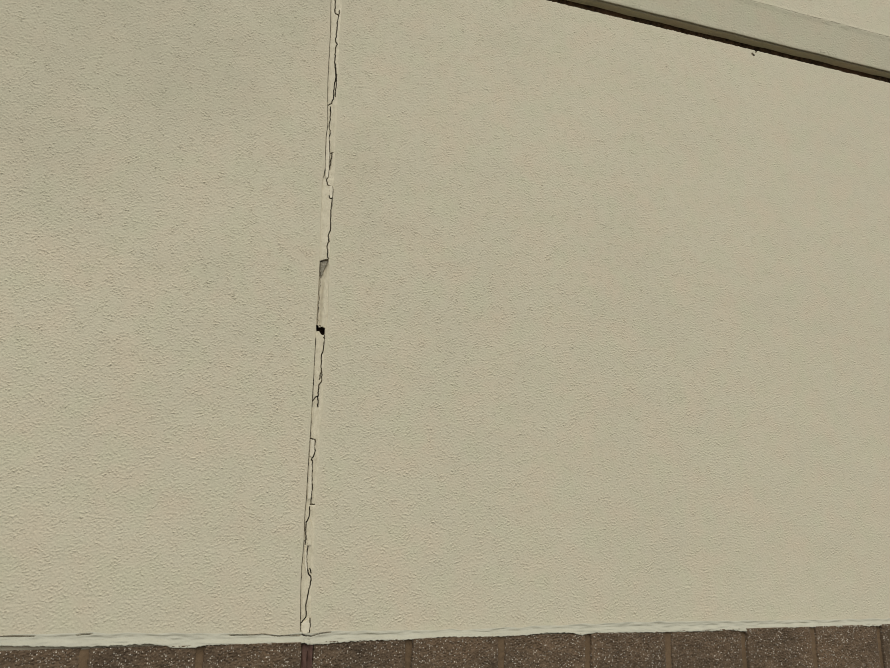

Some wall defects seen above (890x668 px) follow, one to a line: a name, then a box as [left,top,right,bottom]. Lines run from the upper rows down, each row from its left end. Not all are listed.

crack [323,0,340,258]
crack [233,335,330,662]